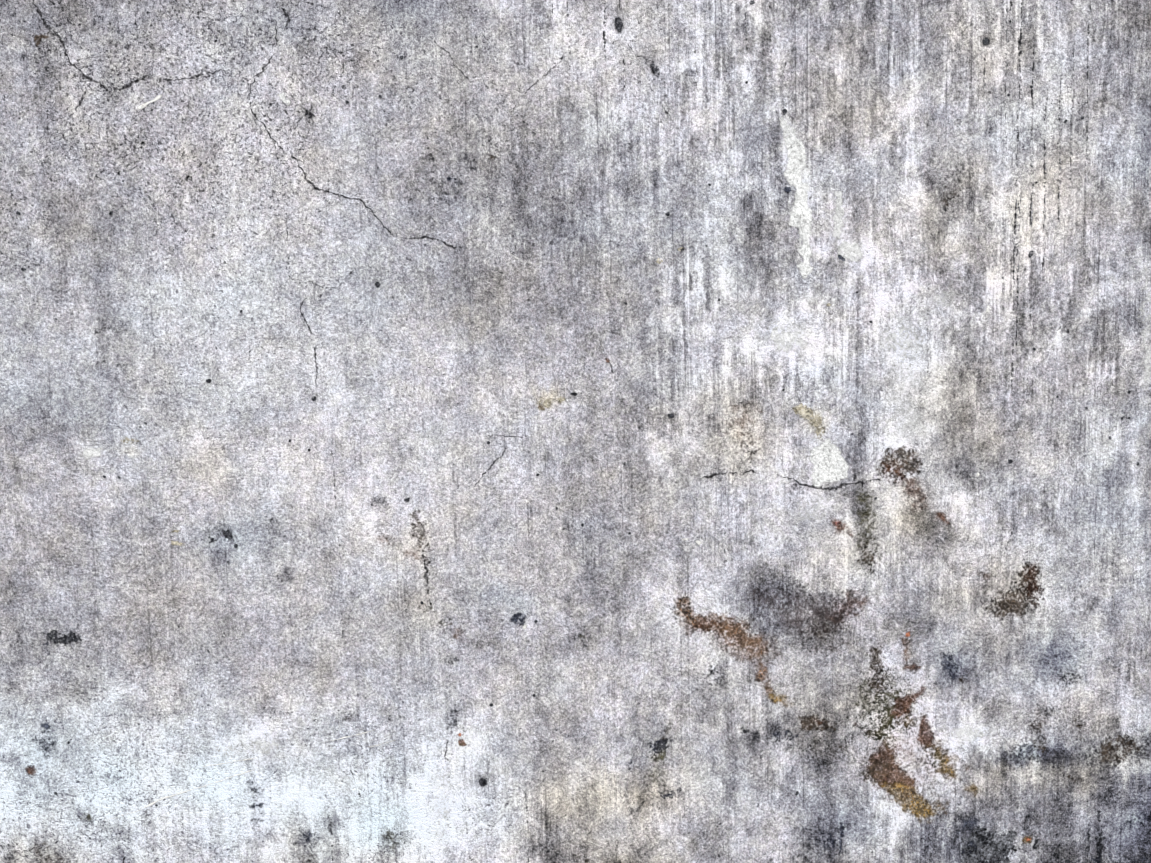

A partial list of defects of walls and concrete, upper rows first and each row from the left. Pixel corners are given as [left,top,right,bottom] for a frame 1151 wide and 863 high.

crack [33,0,219,110]
crack [248,8,460,249]
rust [812,590,871,636]
rust [986,562,1044,621]
rust [672,597,957,823]